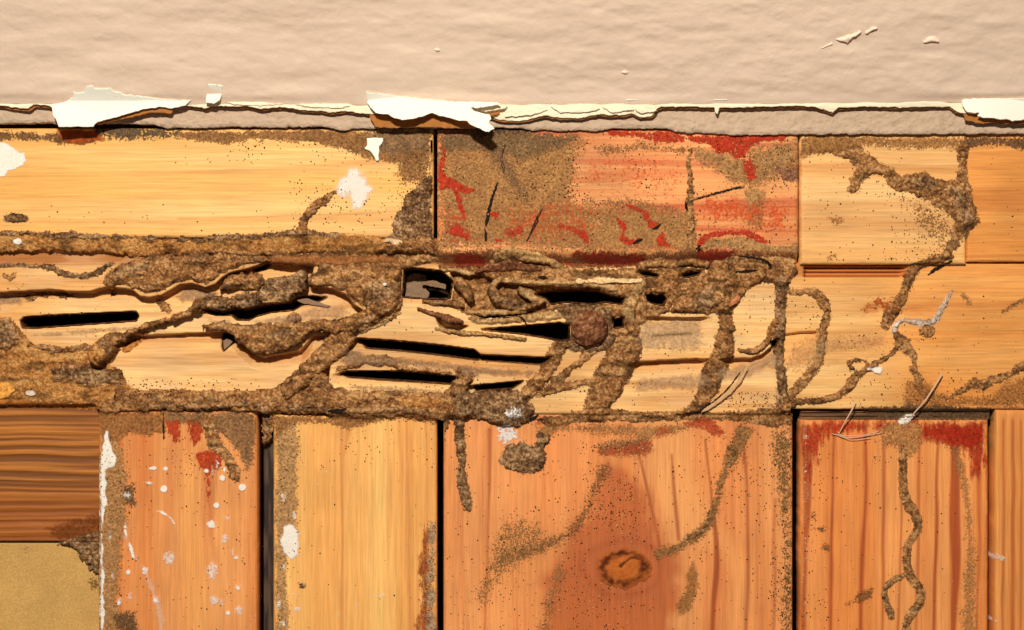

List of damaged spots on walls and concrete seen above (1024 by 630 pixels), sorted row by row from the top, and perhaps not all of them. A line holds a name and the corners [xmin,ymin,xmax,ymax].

spalling [0,84,1024,161]
crack [485,145,506,241]
crack [526,208,543,242]